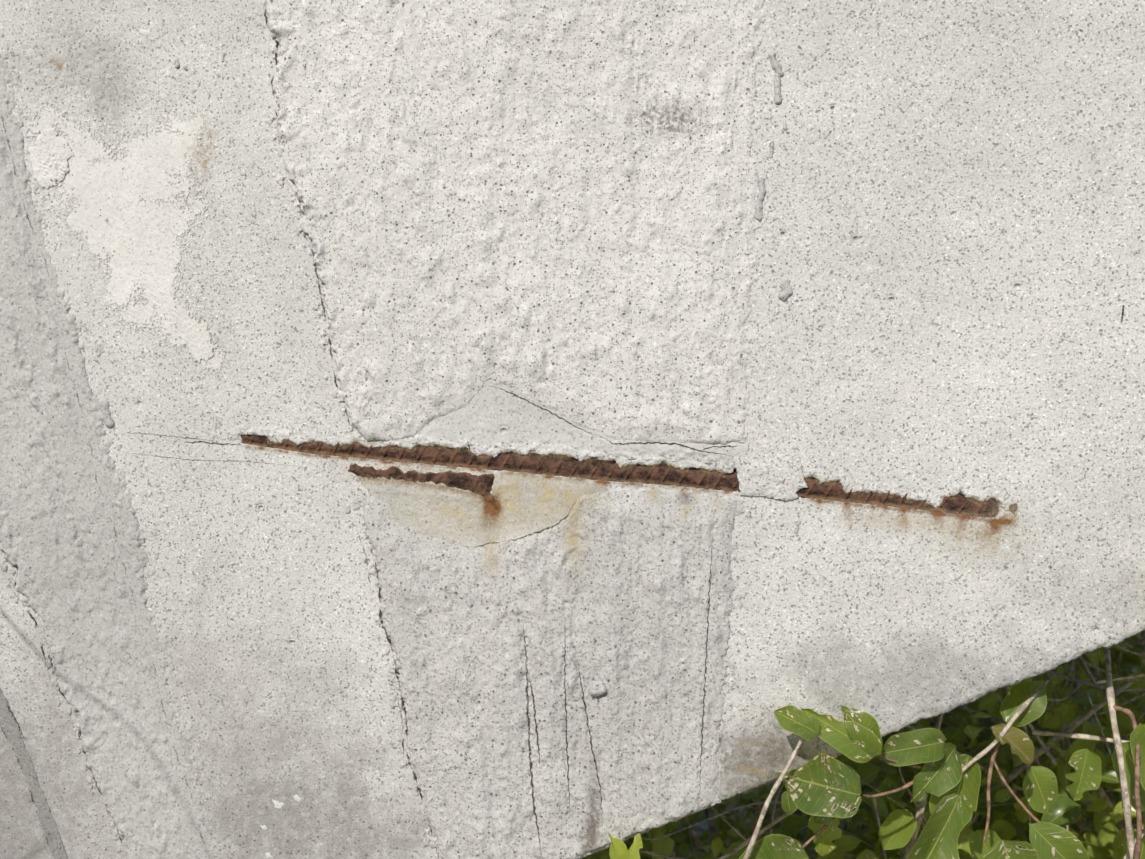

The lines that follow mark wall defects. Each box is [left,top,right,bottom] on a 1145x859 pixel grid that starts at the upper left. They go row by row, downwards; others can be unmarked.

crack [492,386,741,456]
spalling [227,379,1014,512]
spalling [359,470,608,548]
crack [478,501,576,547]
corrosion [441,472,638,549]
corrosion [811,495,1018,535]
crack [522,617,603,859]